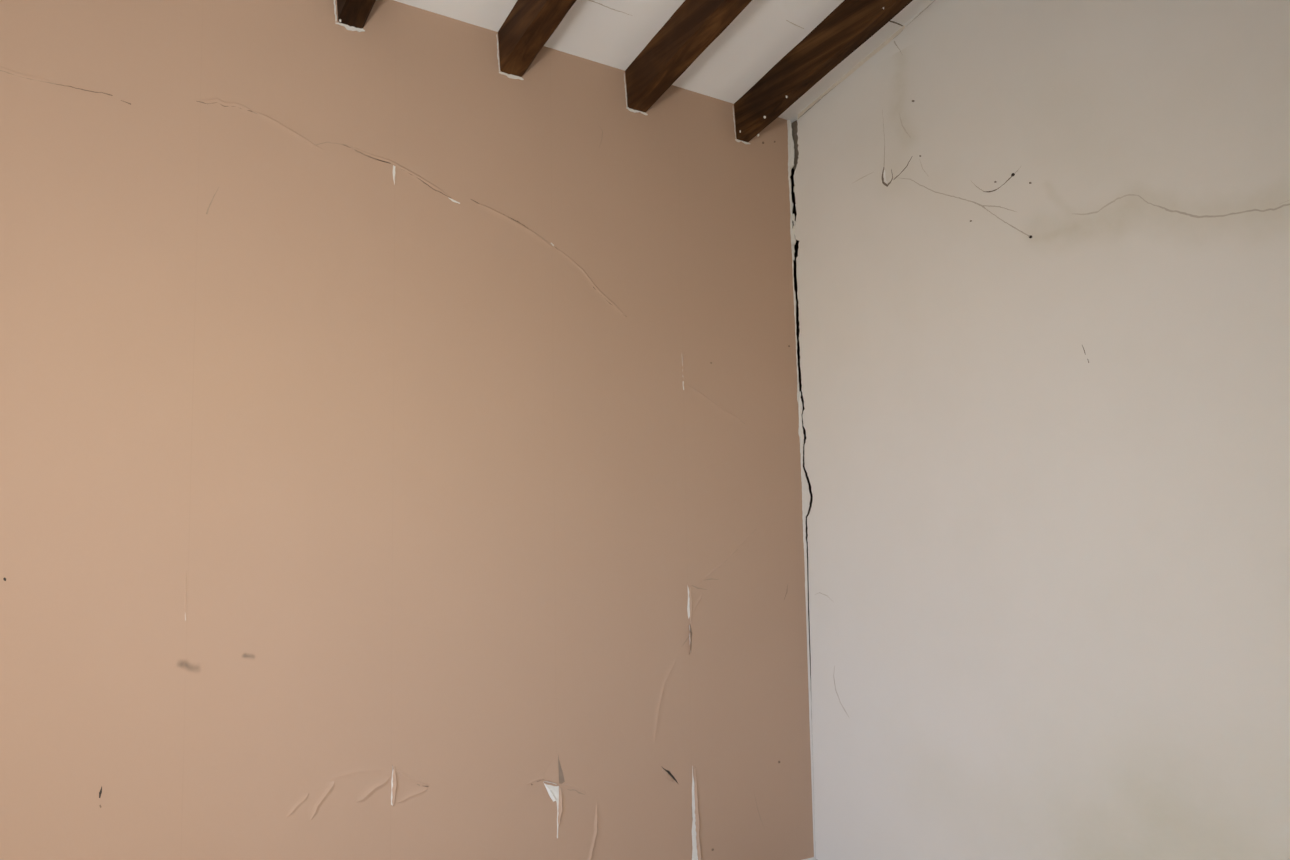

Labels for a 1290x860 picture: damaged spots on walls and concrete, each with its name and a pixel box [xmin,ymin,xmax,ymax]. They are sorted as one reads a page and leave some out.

crack [853,111,1032,238]
crack [1077,194,1290,218]
crack [785,86,836,860]
flaking render [544,781,559,838]